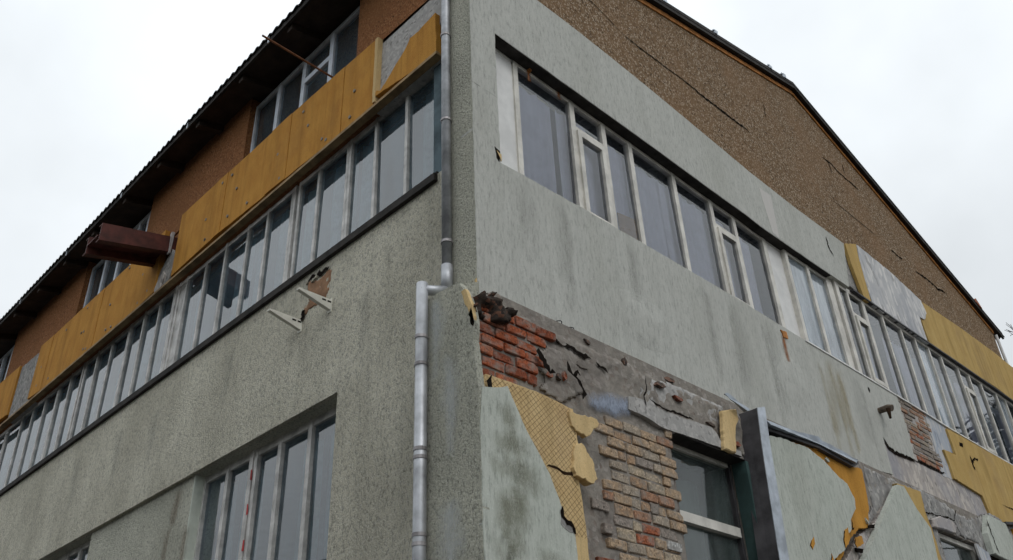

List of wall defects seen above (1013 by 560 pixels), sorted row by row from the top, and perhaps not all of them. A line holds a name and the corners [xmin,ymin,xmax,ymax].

crack [591,1,766,132]
peeling [567,411,599,486]
peeling [640,377,723,430]
flaking render [884,398,945,474]
flaking render [560,506,576,534]
flaking render [794,442,1013,560]